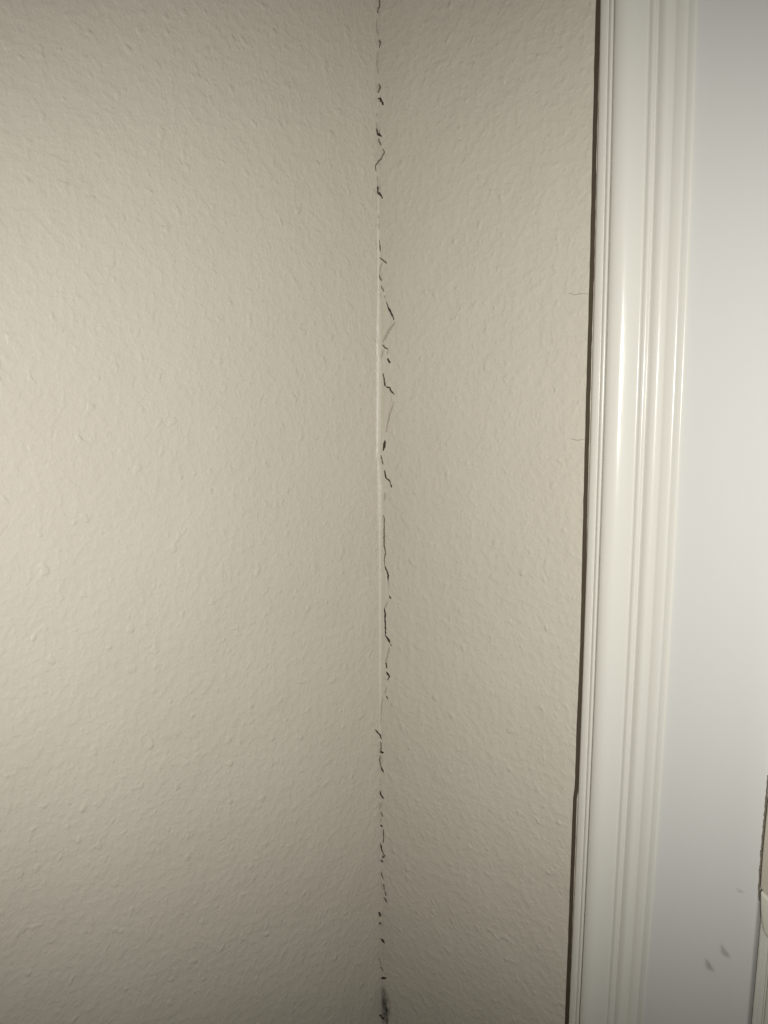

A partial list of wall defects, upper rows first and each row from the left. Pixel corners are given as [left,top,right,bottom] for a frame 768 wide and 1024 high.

crack [375,0,395,979]